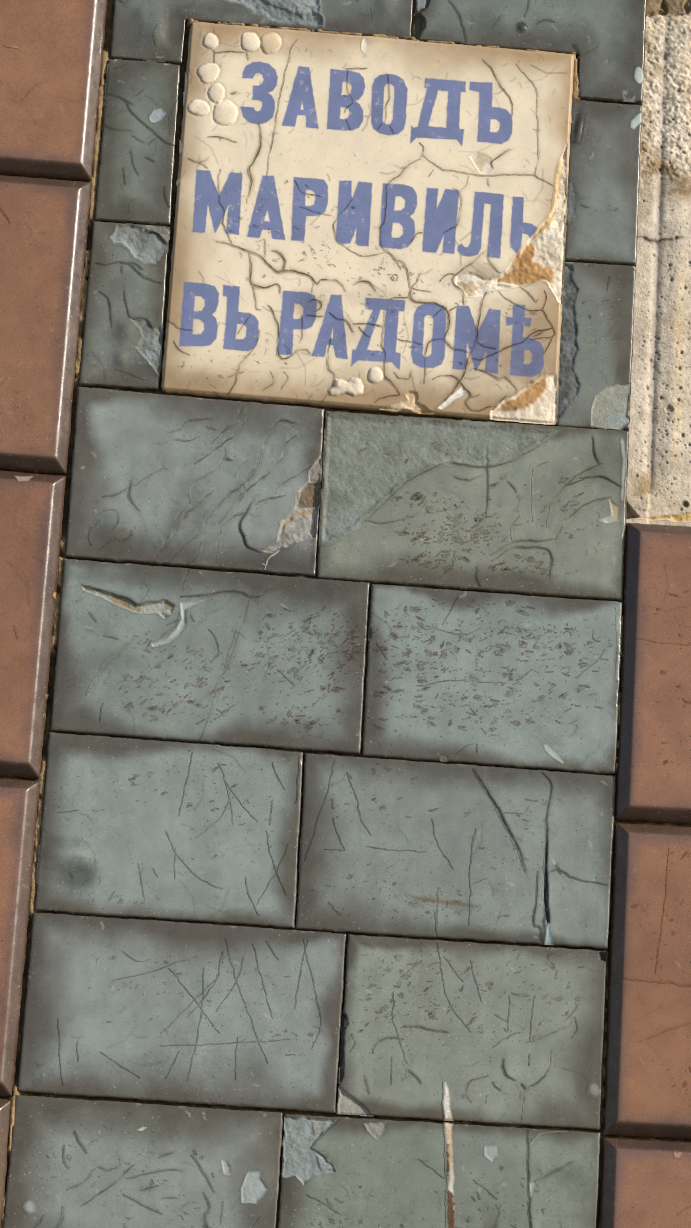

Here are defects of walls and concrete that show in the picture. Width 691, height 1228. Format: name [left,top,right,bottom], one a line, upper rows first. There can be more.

spalling [220,0,328,32]
peeling [414,0,430,41]
peeling [641,0,691,168]
crack [82,0,622,741]
spalling [258,143,581,554]
peeling [590,182,691,527]
spalling [81,585,209,648]
crack [473,768,608,943]
peeling [314,1152,334,1172]
peeling [310,1086,388,1141]